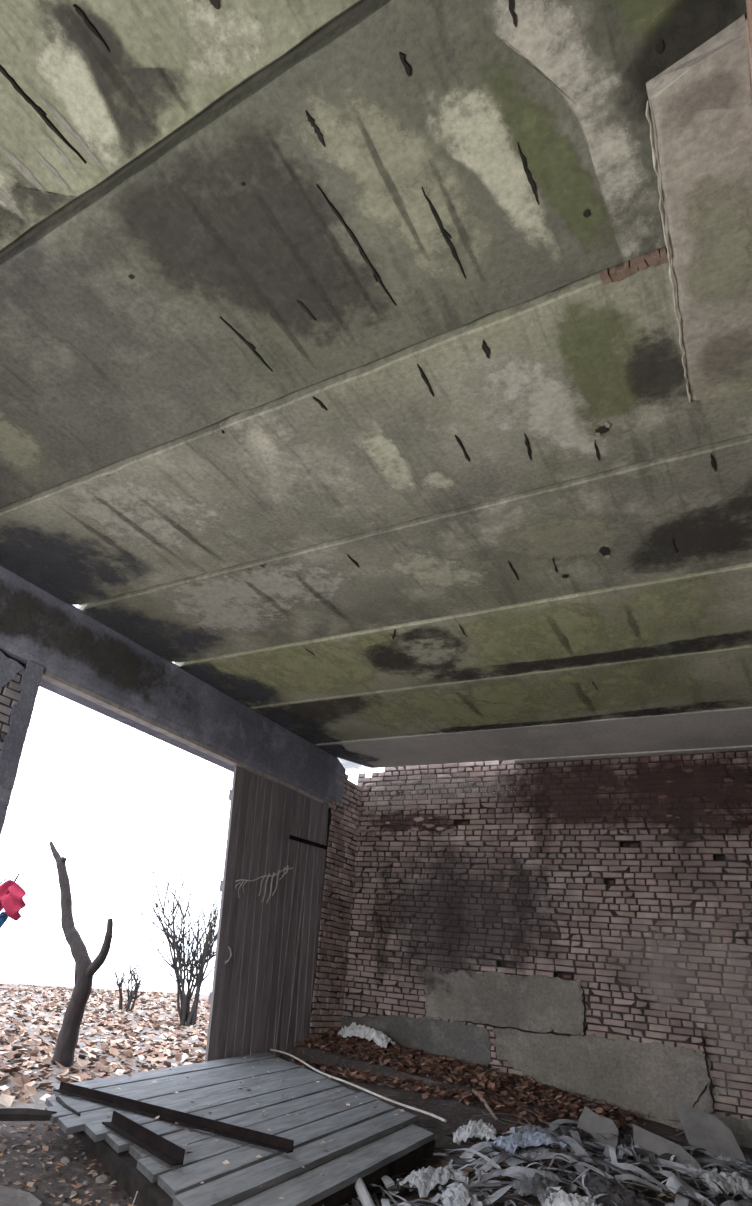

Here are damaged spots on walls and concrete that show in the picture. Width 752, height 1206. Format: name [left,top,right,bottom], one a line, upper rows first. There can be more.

crack [0,65,86,164]
damp [36,2,180,166]
damp [496,0,738,257]
damp [0,137,73,233]
damp [125,134,387,337]
crack [317,184,396,306]
crack [422,188,466,279]
crack [220,316,273,372]
damp [627,339,690,400]
damp [633,486,752,572]
damp [367,627,752,682]